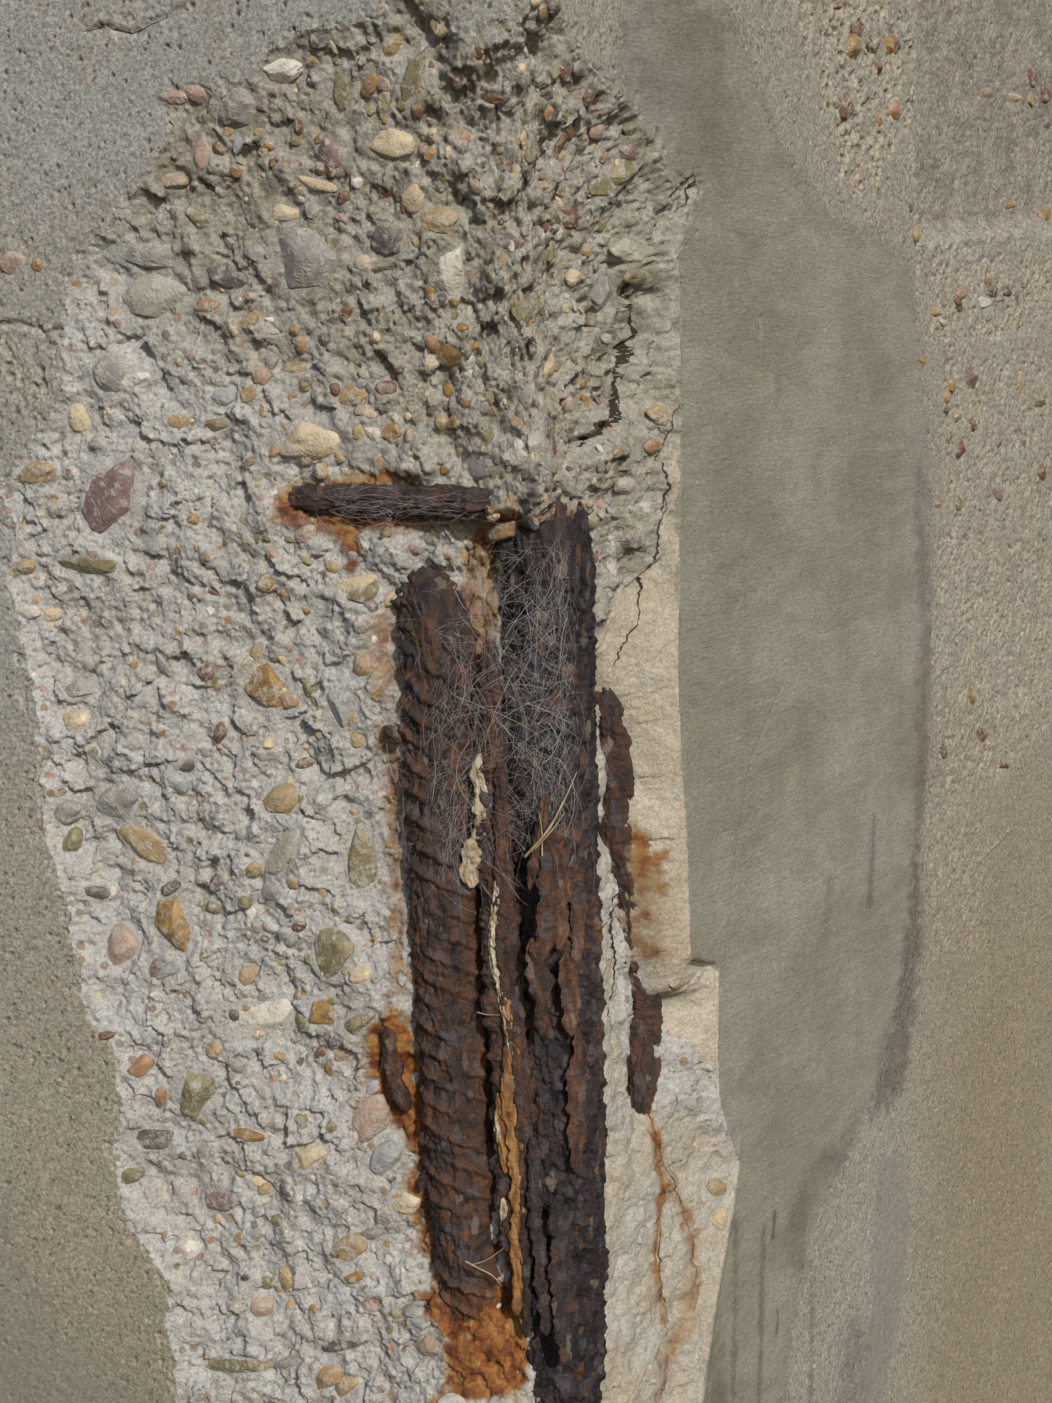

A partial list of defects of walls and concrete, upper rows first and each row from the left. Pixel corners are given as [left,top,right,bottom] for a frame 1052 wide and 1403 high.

rust [324,470,415,487]
rust [274,486,433,569]
spalling [0,0,739,1403]
rust [629,823,666,889]
rust [364,506,590,1403]